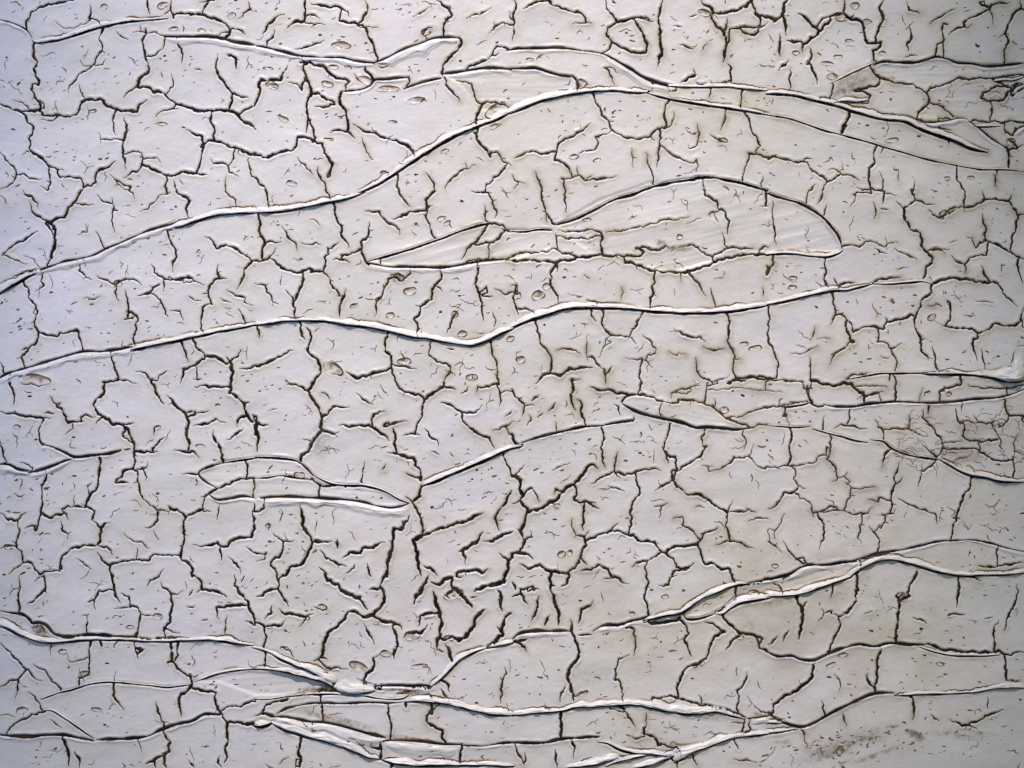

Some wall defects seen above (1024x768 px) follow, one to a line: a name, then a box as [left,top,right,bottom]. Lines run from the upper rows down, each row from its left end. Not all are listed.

crack [287,0,387,68]
spalling [328,64,426,104]
crack [600,0,683,67]
crack [579,69,713,185]
crack [685,0,1024,186]
crack [447,80,512,332]
crack [78,231,227,363]
crack [495,172,774,396]
crack [136,337,293,463]
crack [875,376,1024,487]
crack [818,546,1024,682]
crack [651,614,815,749]